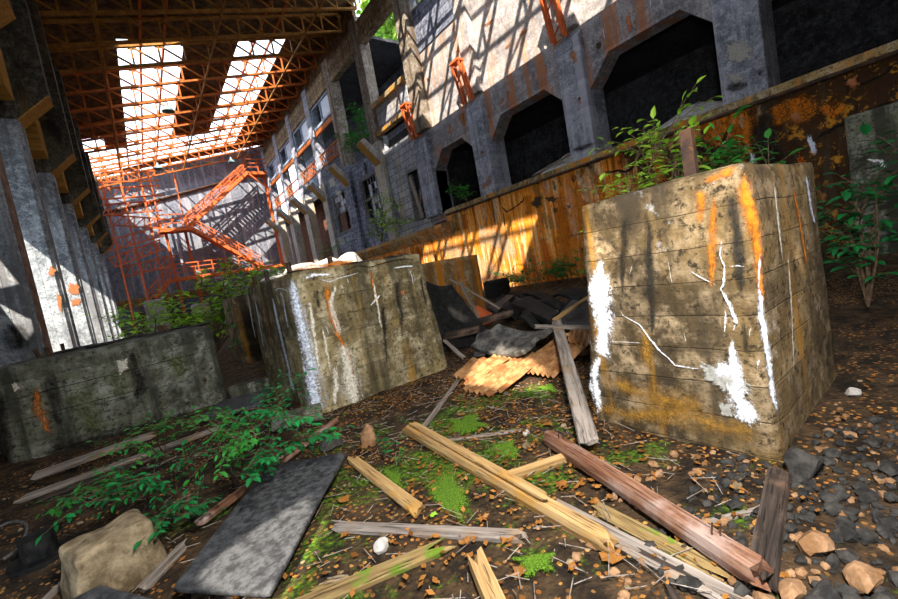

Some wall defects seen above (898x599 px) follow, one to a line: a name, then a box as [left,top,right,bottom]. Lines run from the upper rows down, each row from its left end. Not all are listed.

rust [728,112,752,144]
rust [772,96,845,125]
rust [521,174,606,282]
leakage [645,221,655,331]
rust [697,192,716,277]
leakage [728,197,745,289]
rust [741,179,763,294]
rust [326,287,354,378]
leakage [589,263,613,413]
leakage [715,325,758,423]
leakage [756,259,775,403]